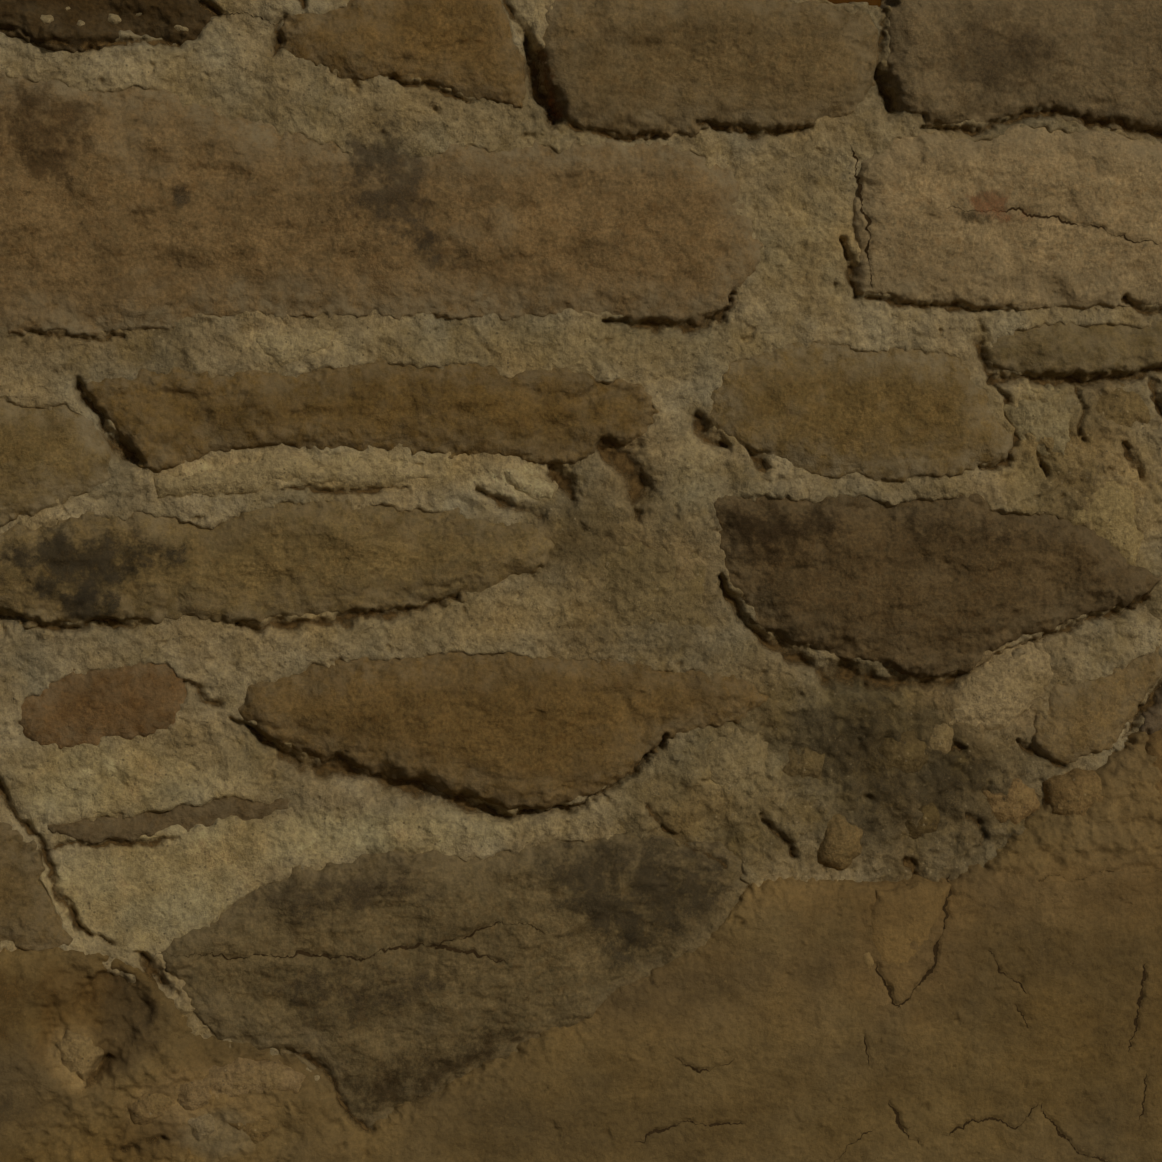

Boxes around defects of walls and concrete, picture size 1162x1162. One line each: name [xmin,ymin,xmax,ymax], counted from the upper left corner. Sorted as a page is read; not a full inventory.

crack [851,148,873,288]
crack [946,206,1158,245]
crack [874,875,952,1007]
crack [1128,963,1146,1052]
crack [1139,1075,1147,1120]
crack [634,1120,742,1143]
crack [834,1100,1110,1162]